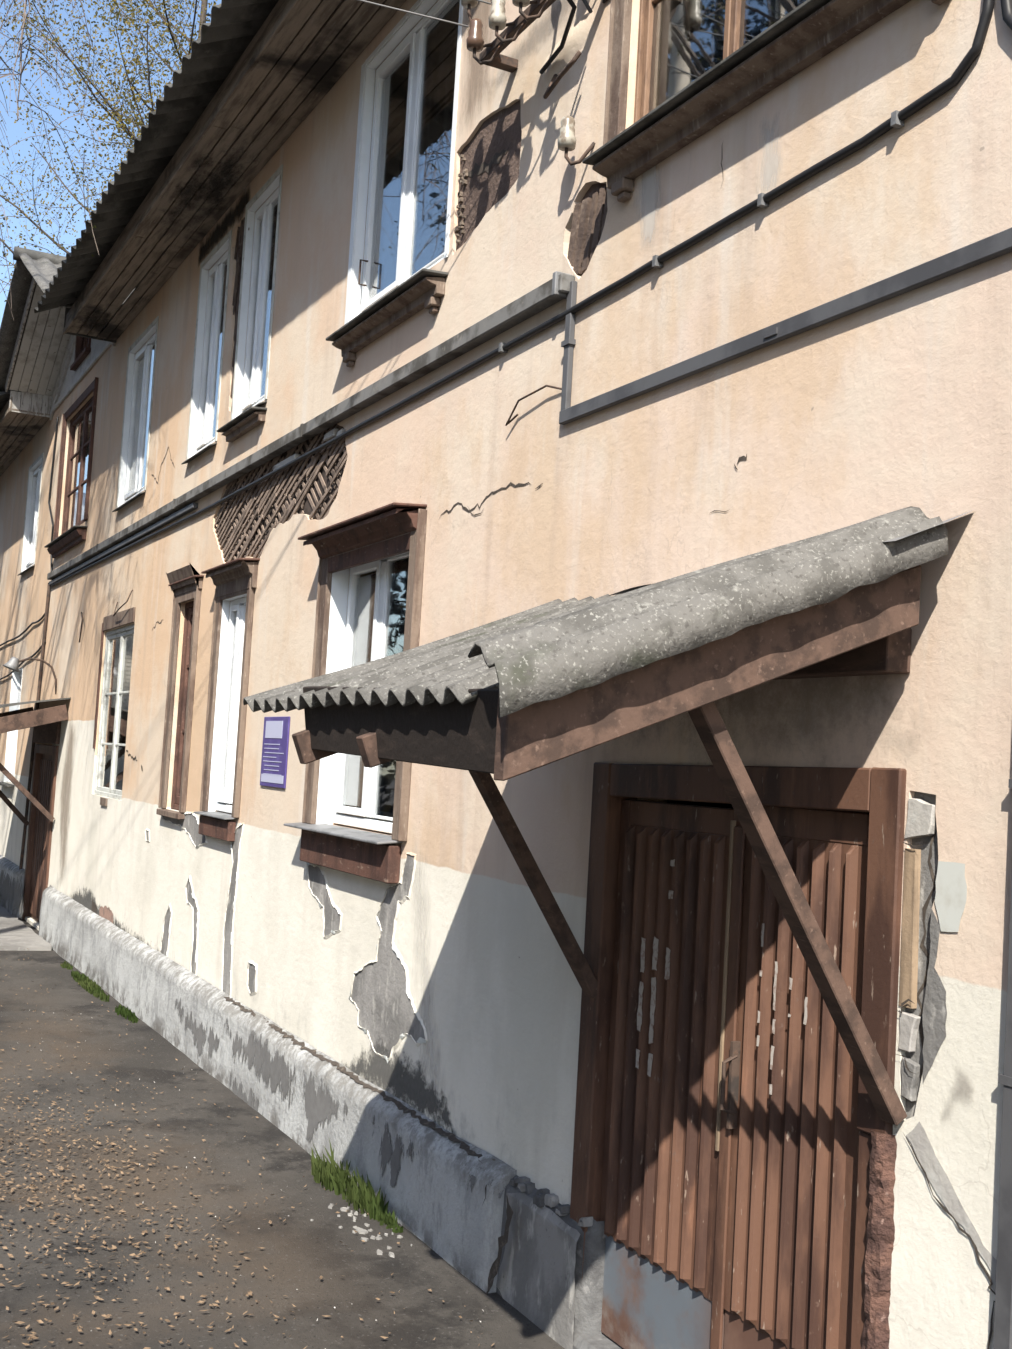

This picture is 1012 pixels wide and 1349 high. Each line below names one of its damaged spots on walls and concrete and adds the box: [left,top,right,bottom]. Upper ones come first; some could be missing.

crack [441,482,542,516]
peeling [160,875,199,975]
peeling [161,811,208,849]
peeling [222,822,258,996]
peeling [307,862,343,939]
peeling [348,852,428,1064]
spalling [896,791,947,1120]
peeling [174,998,348,1142]